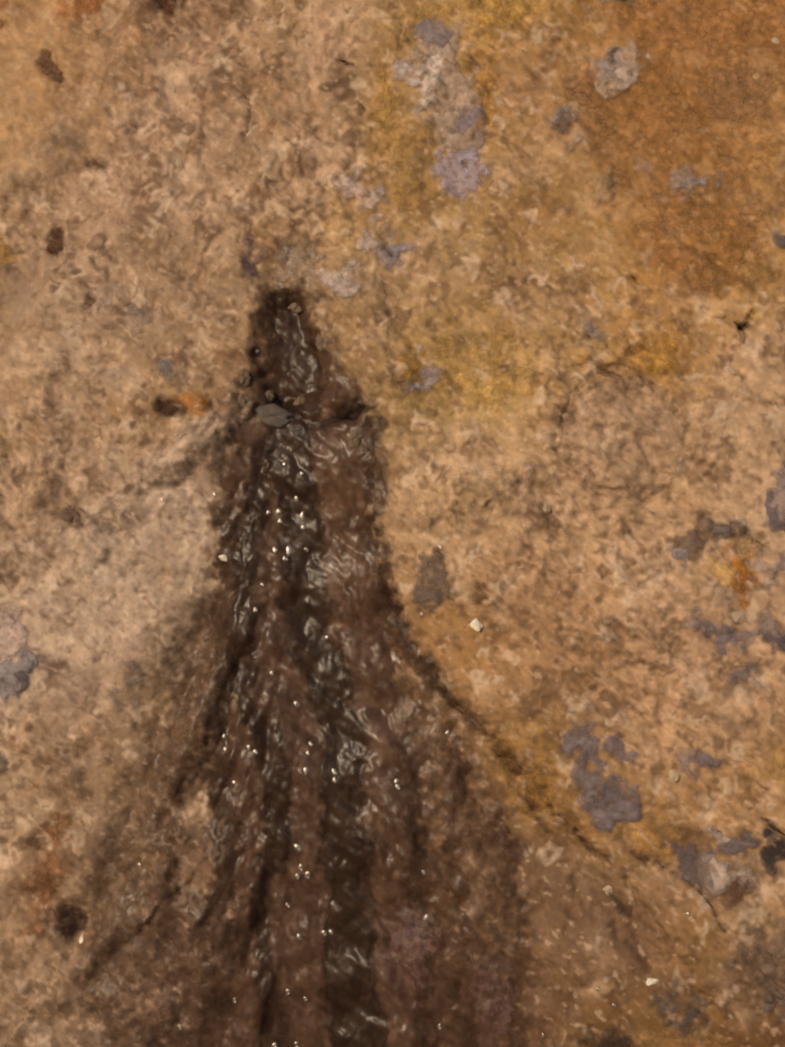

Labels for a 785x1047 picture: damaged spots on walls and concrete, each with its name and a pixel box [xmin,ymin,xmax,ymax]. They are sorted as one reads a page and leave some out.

water stain [75,280,533,1047]